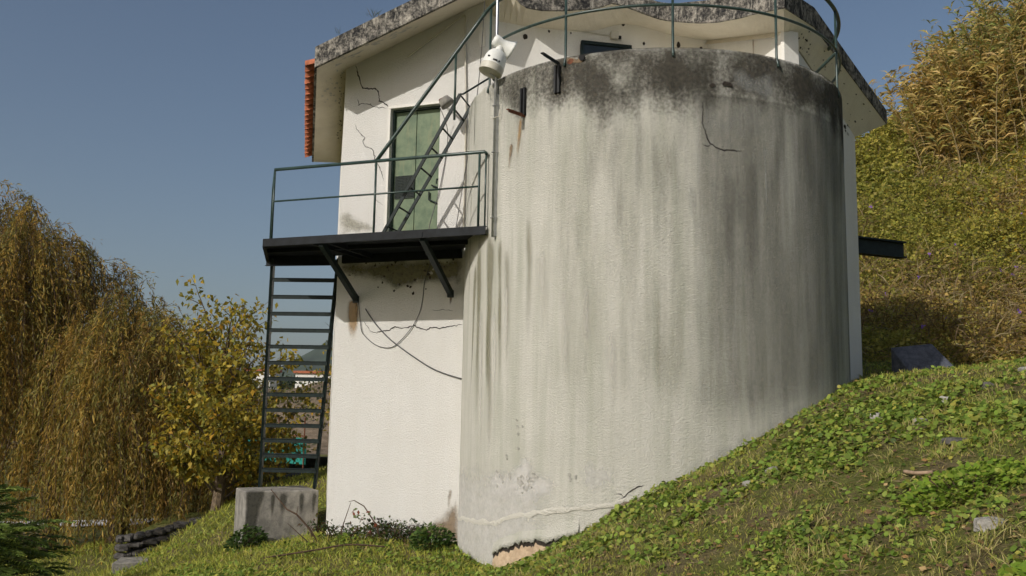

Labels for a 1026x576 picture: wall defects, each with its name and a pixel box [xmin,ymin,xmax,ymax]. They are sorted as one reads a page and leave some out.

crack [356,67,392,176]
crack [701,102,742,152]
corrosion [349,301,357,330]
peeling [458,419,579,568]